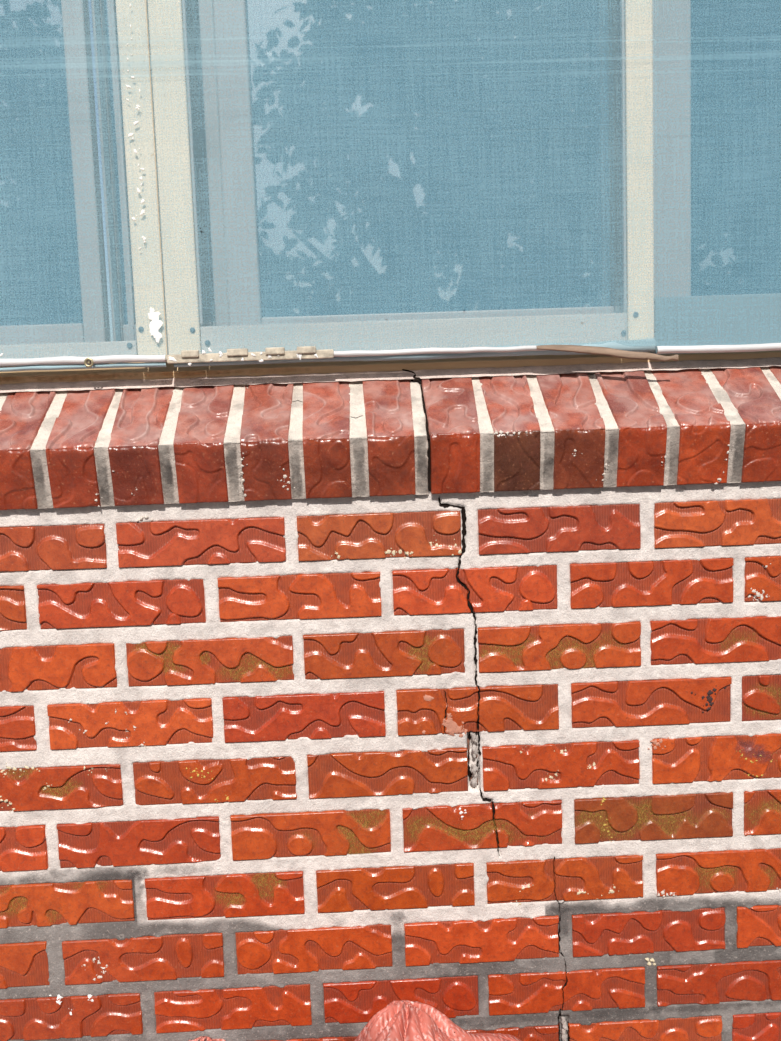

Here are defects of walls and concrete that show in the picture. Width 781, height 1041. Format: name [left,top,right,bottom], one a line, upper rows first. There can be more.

crack [402,369,499,852]
crack [554,857,570,1041]